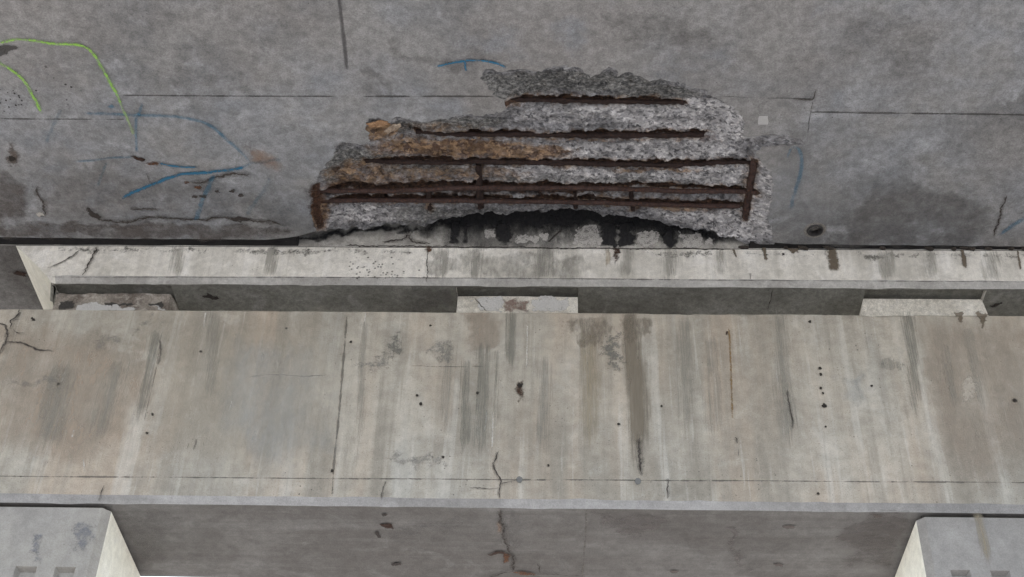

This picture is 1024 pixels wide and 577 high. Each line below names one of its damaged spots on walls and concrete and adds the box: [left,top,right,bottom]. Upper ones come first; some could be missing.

spalling [310,65,805,248]
crack [86,172,282,226]
rust [308,184,323,227]
crack [993,195,1007,235]
crack [0,311,52,353]
water stain [570,314,650,446]
crack [474,451,567,577]